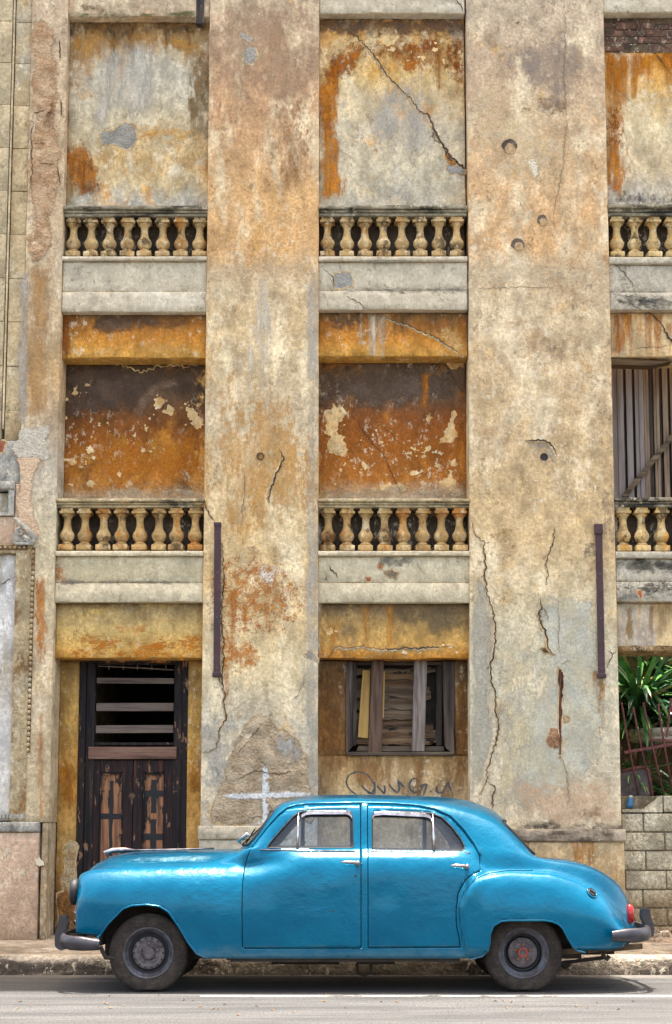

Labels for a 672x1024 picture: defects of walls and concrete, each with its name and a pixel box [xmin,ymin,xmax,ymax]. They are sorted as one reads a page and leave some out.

spalling [26,0,62,261]
spalling [98,121,138,151]
corrosion [323,38,463,87]
crack [351,31,465,169]
corrosion [607,52,672,192]
spalling [0,426,51,536]
peeling [127,394,204,453]
peeling [322,404,458,494]
crack [203,500,305,779]
corrosion [207,553,305,667]
crack [471,523,500,808]
crack [536,527,569,664]